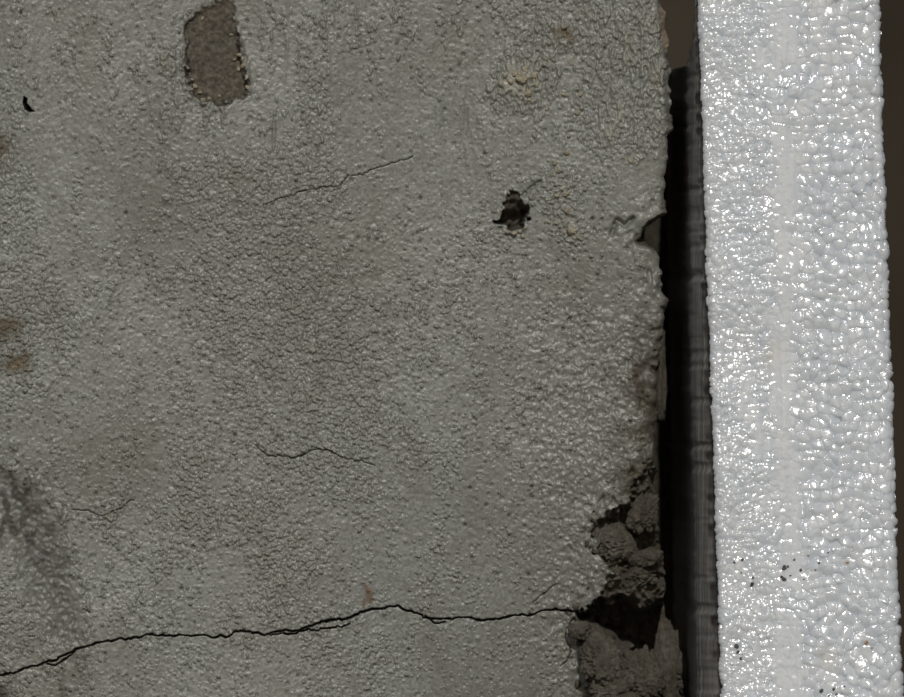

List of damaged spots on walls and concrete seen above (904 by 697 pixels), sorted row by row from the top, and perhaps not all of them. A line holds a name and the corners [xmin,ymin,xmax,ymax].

flaking render [183,0,251,107]
spalling [560,462,684,697]
crack [0,605,578,676]